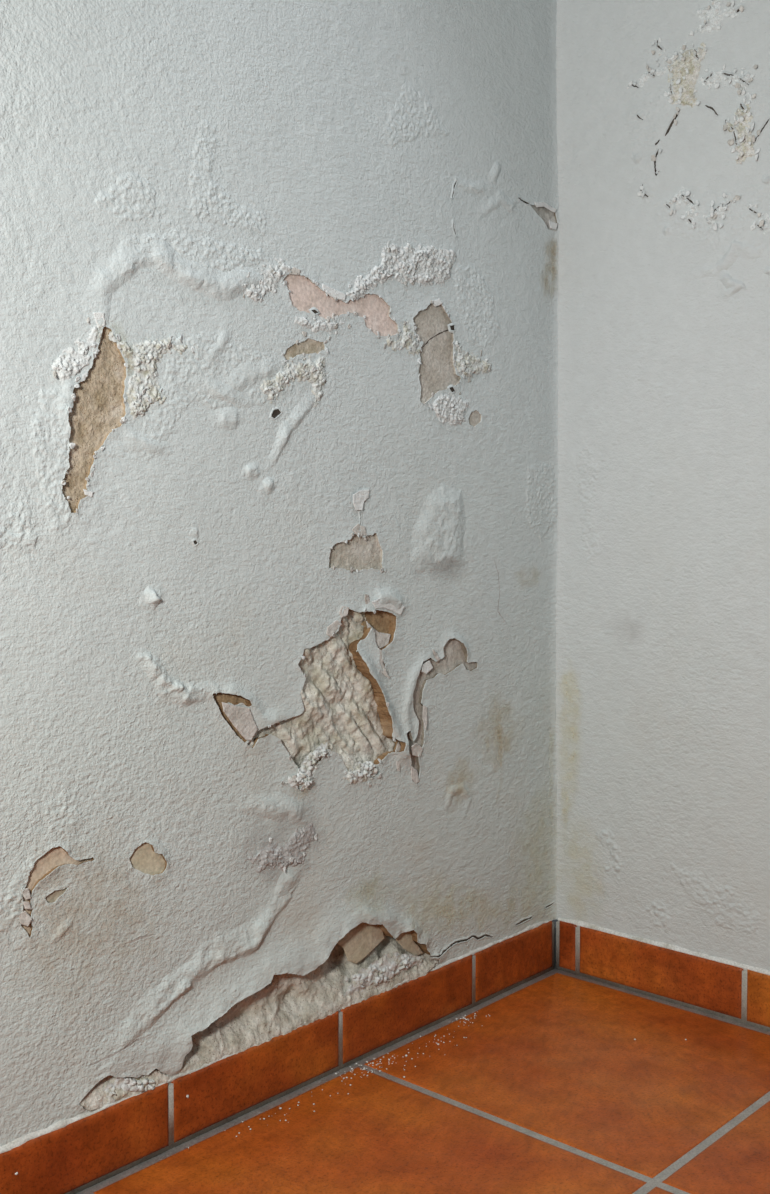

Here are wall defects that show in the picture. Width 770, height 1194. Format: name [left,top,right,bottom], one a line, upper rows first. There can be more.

peeling [626,0,761,164]
flaking render [52,312,195,513]
flaking render [242,241,492,427]
flaking render [329,489,386,573]
flaking render [213,594,477,791]
flaking render [19,846,94,937]
flaking render [129,842,167,875]
flaking render [79,922,439,1111]